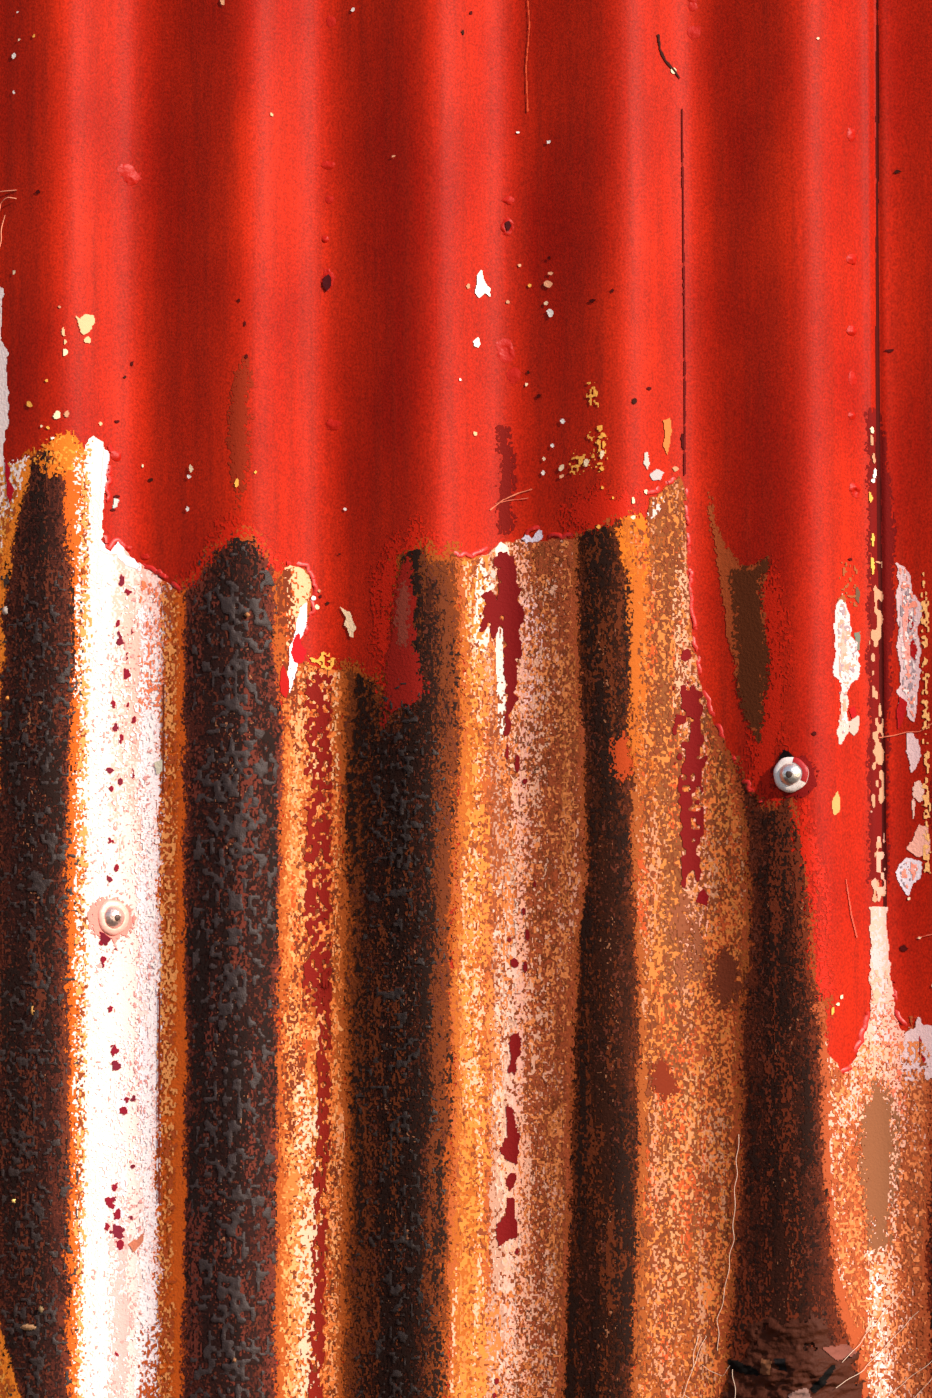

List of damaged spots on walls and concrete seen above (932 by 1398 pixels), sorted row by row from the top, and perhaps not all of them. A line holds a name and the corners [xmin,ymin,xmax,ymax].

peeling [586,382,599,407]
peeling [541,425,614,499]
peeling [869,427,877,503]
peeling [285,565,356,662]
peeling [307,652,339,671]
peeling [832,533,931,902]
peeling [900,1017,932,1085]